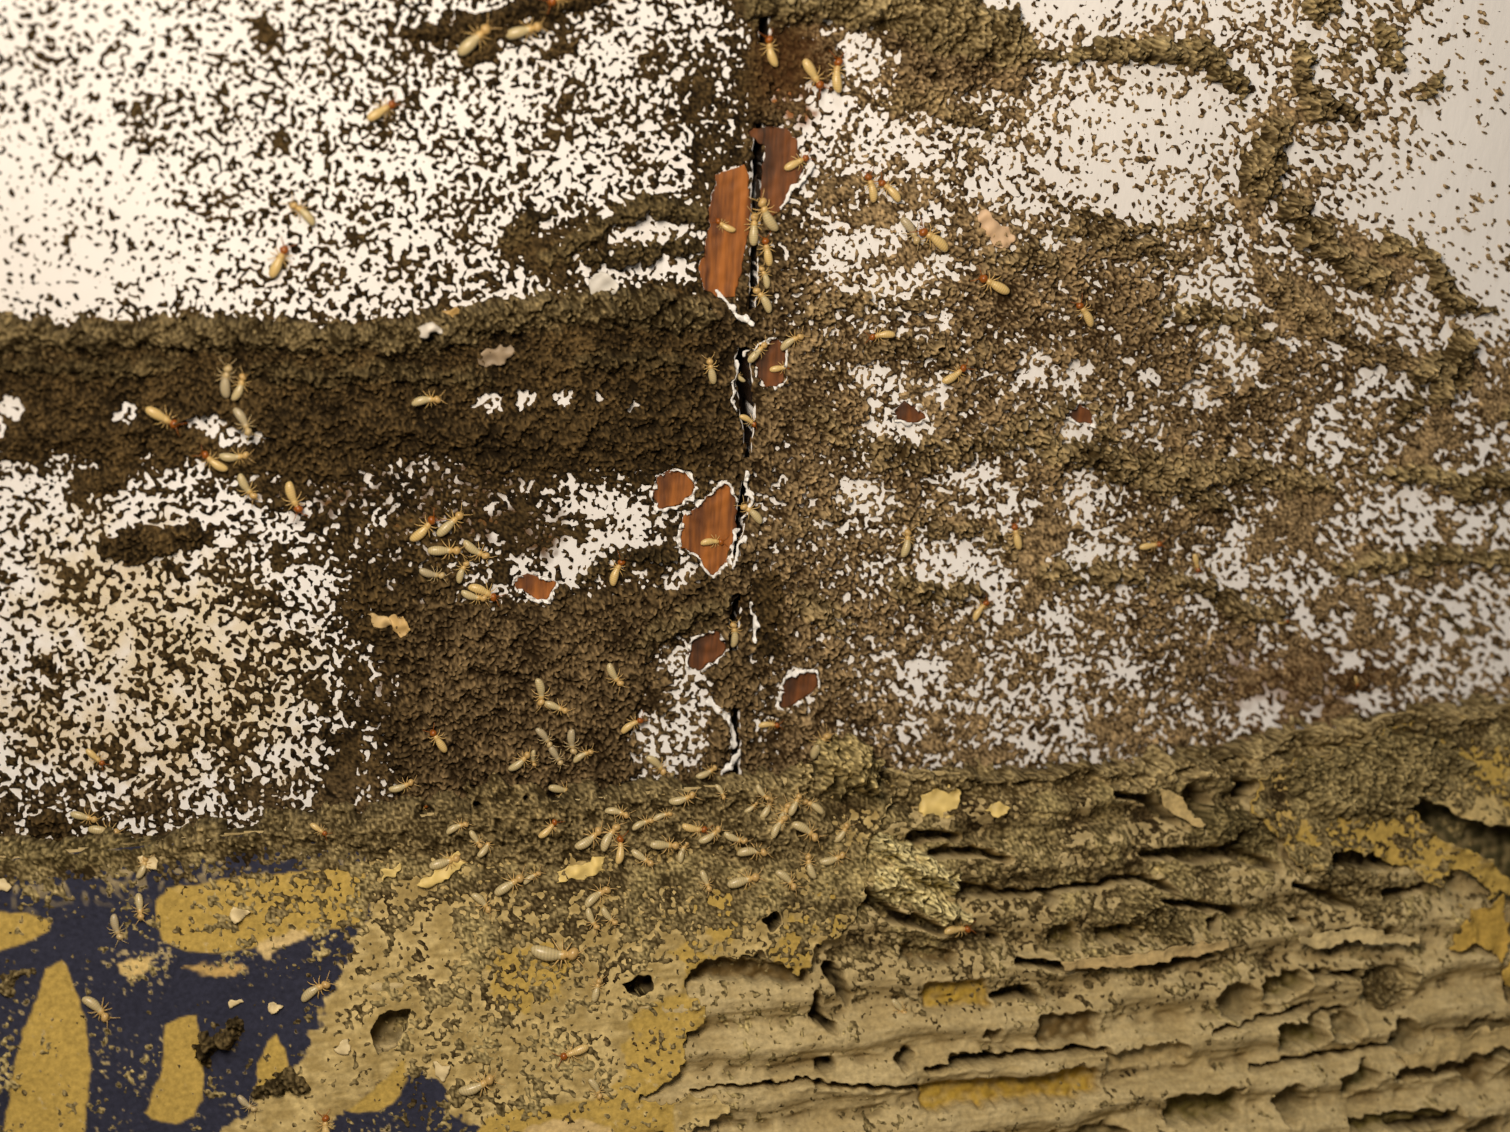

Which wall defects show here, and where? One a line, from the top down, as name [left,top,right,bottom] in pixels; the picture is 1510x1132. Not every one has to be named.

crack [759,17,769,43]
peeling [698,126,804,298]
crack [695,124,815,651]
peeling [649,468,740,579]
peeling [685,631,729,672]
peeling [775,667,820,711]
crack [705,696,762,775]